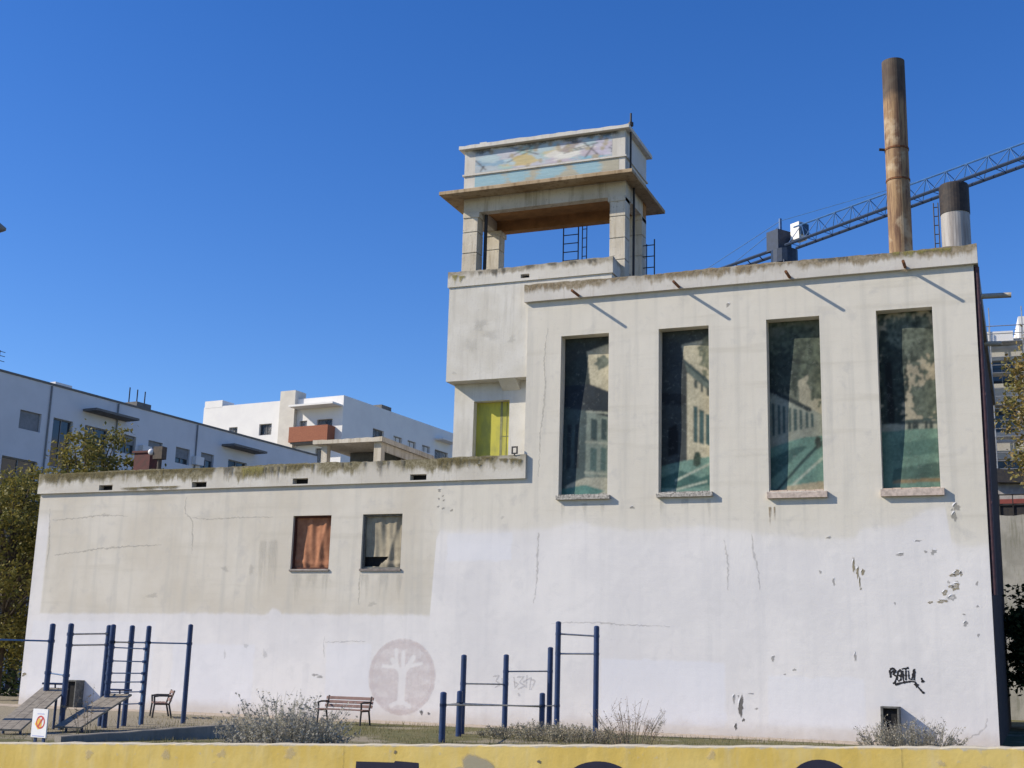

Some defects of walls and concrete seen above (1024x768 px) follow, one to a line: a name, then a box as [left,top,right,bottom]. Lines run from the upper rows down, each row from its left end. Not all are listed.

leakage [112,467,233,490]
leakage [248,463,314,477]
leakage [444,458,481,466]
peeling [928,570,963,604]